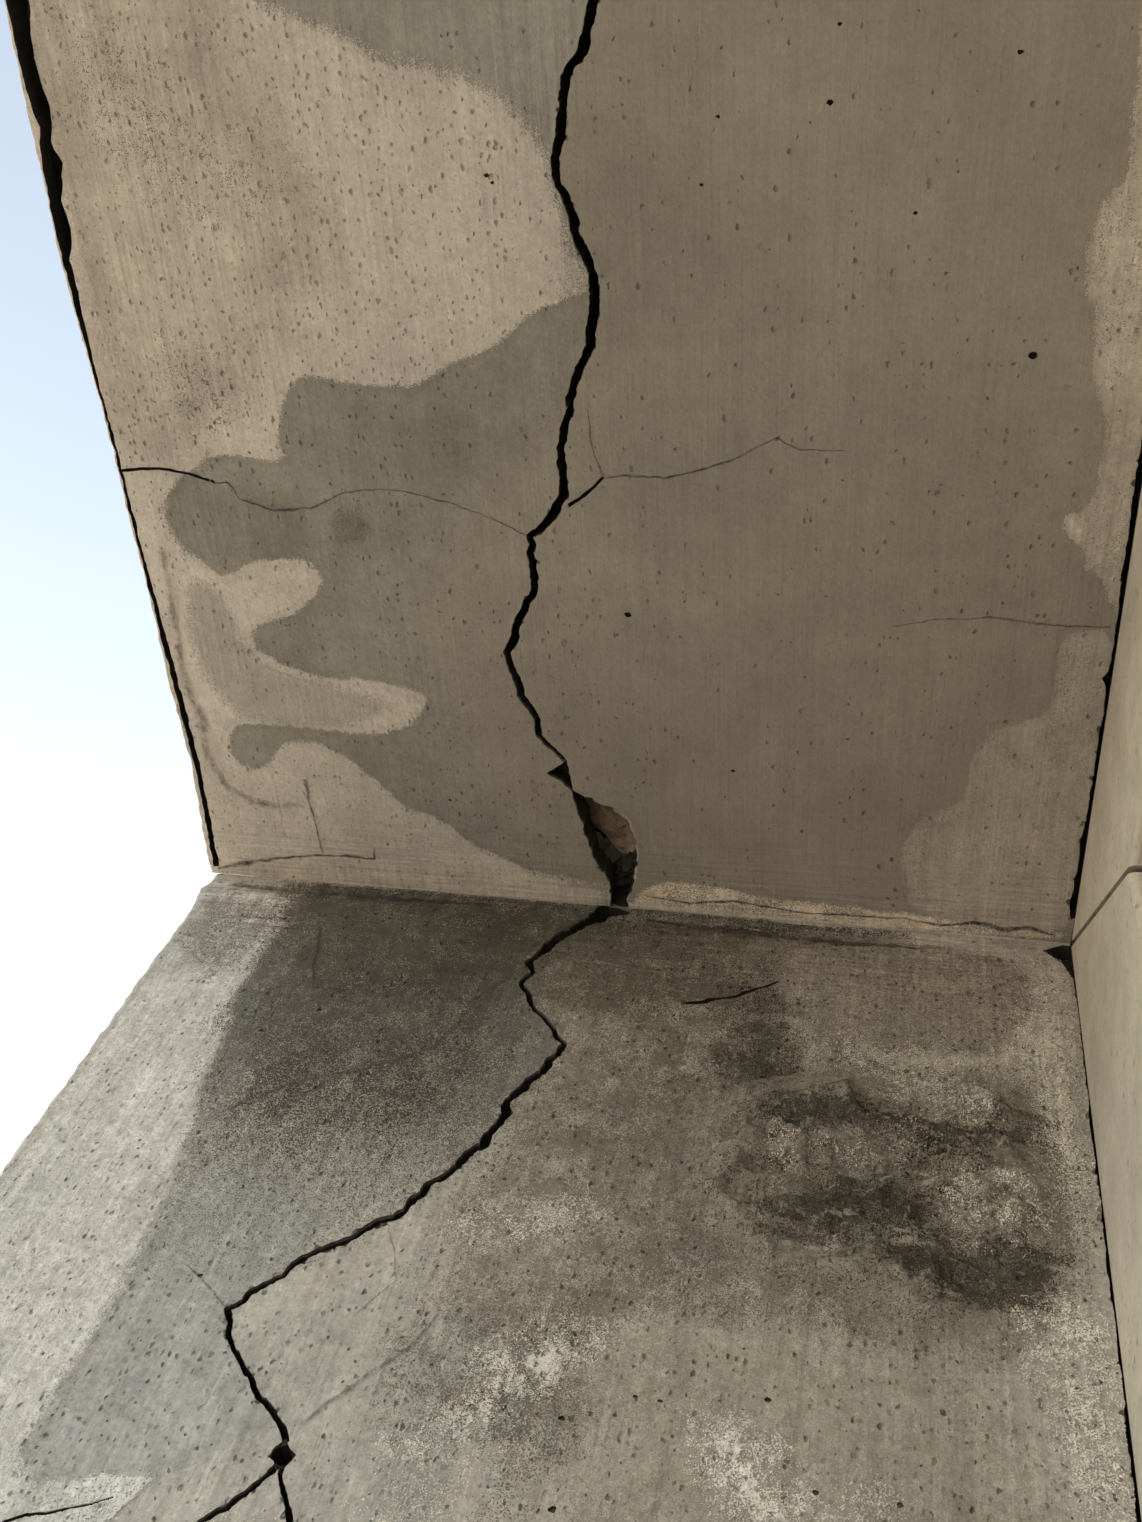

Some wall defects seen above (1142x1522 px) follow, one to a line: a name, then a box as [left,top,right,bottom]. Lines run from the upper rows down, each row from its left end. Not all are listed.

crack [2,1497,113,1522]
leakage [156,288,609,938]
crack [118,0,841,792]
leakage [10,881,1137,1522]
spalling [572,791,638,909]
crack [194,420,1142,1522]